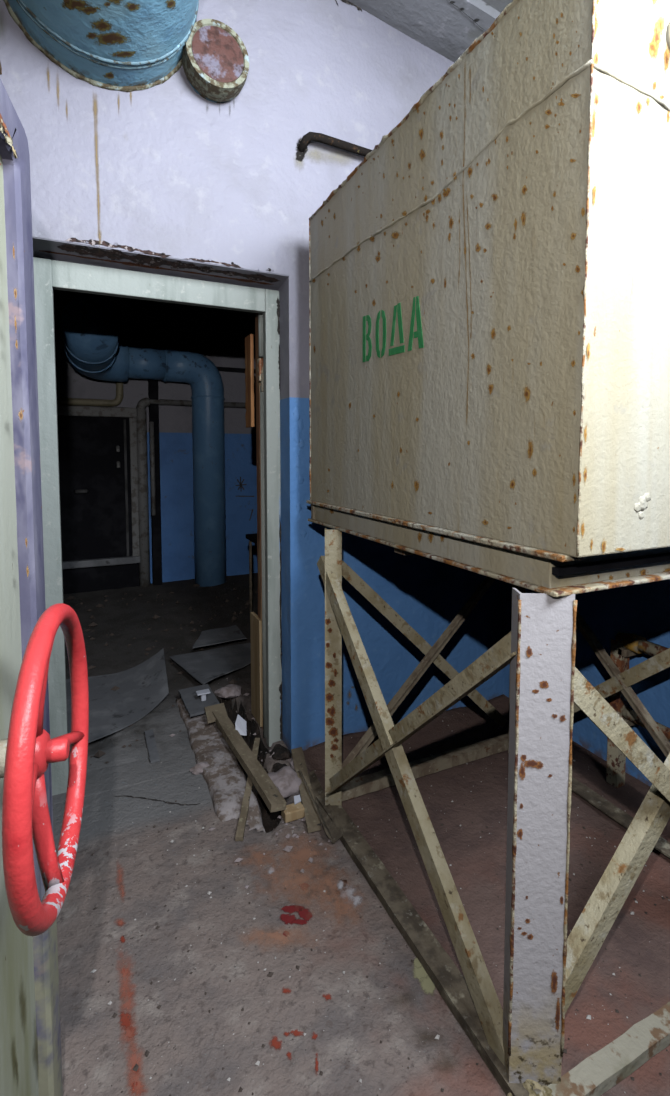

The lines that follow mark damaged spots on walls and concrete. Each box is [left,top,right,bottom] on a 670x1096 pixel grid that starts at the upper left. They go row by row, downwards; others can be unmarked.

peeling [39,238,279,285]